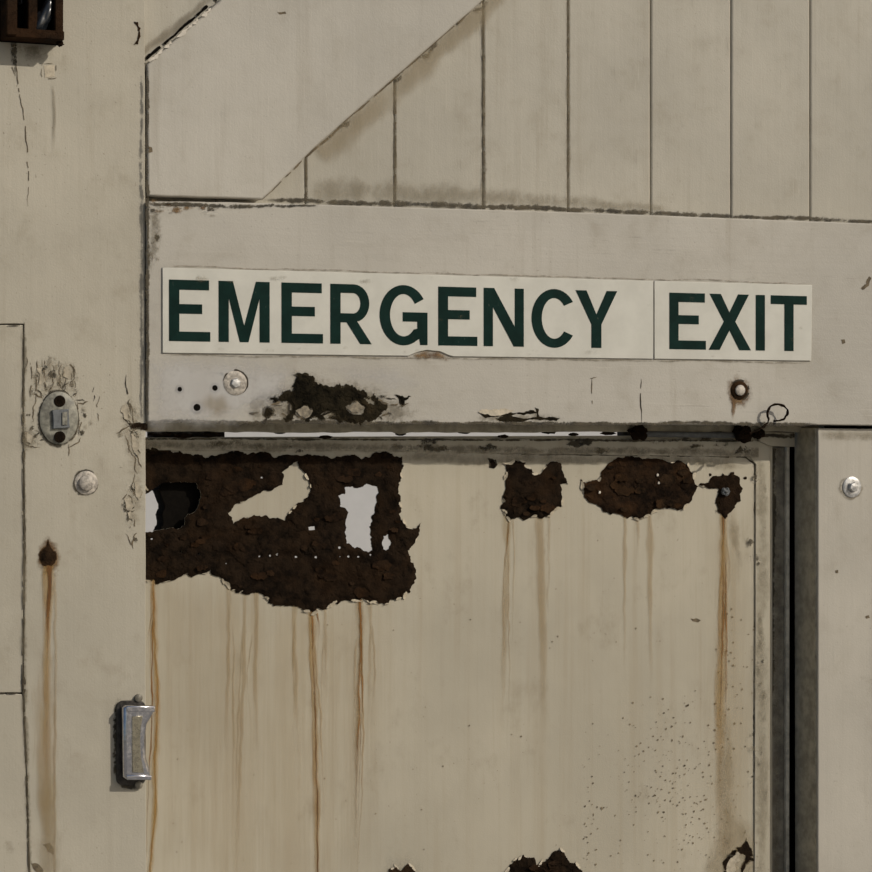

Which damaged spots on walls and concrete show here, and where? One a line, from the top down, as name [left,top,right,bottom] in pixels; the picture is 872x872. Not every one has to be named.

corrosion [729,379,749,414]
corrosion [39,540,59,629]
corrosion [580,456,747,683]
corrosion [145,447,420,872]
peeling [722,838,754,872]